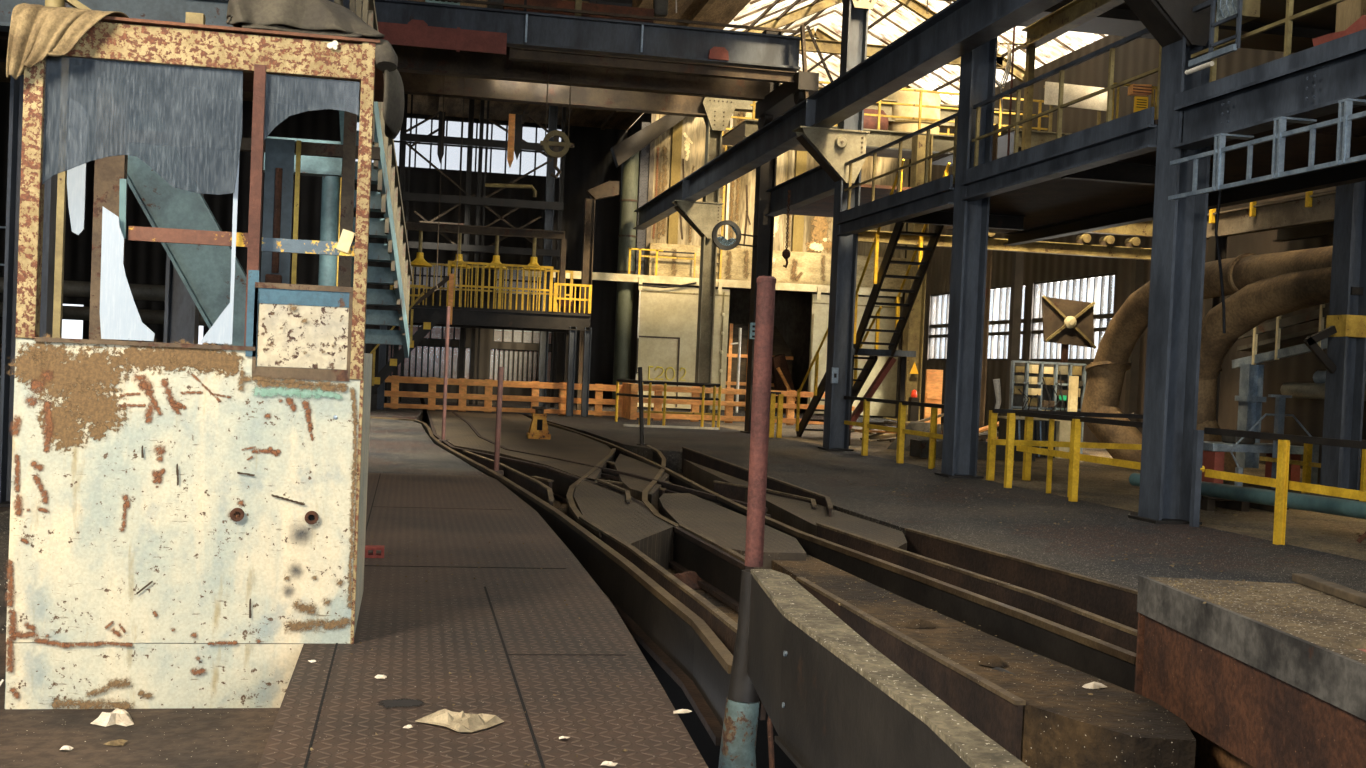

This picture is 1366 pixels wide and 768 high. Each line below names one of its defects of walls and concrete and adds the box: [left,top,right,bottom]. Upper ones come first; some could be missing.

rust [11,370,54,516]
rust [118,370,358,632]
rust [6,560,133,699]
rust [51,678,153,710]
rust [171,629,238,675]